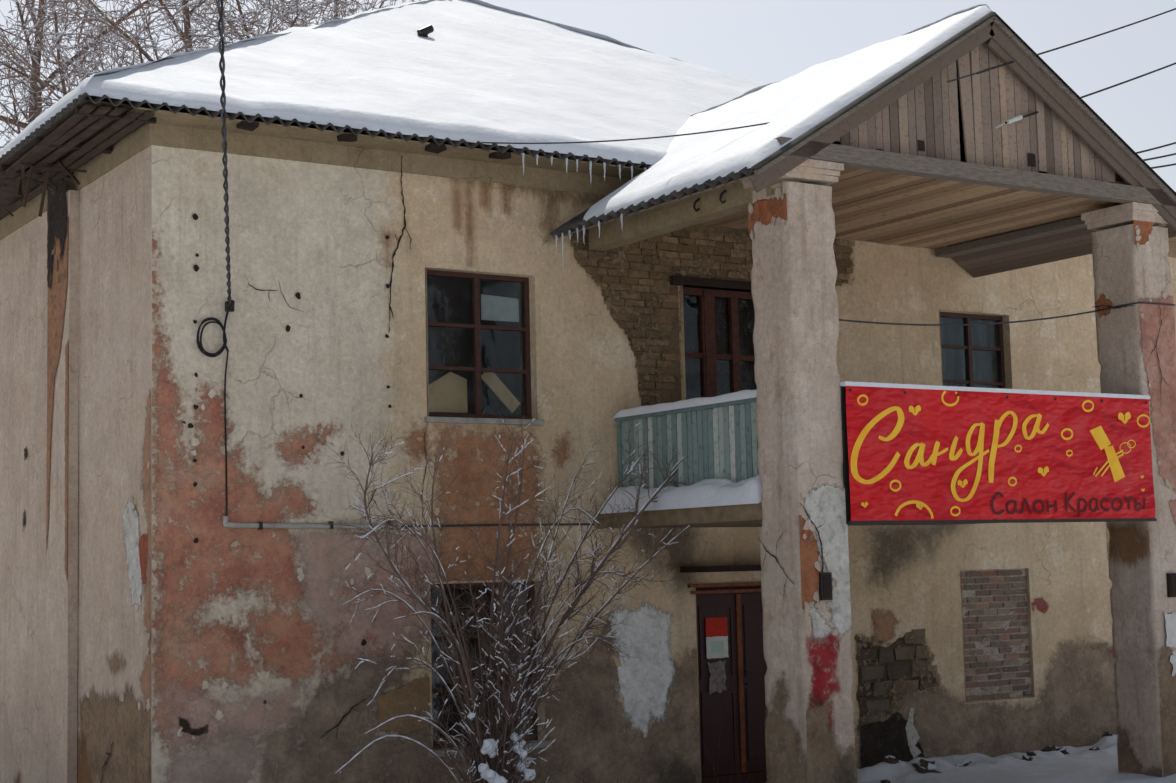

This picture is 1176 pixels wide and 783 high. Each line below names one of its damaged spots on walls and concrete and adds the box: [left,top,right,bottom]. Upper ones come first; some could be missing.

flaking render [46,178,69,579]
crack [248,283,303,312]
crack [389,156,412,331]
flaking render [570,188,787,406]
flaking render [833,239,855,286]
flaking render [1133,220,1169,248]
peeling [1138,291,1176,522]
peeling [78,271,541,783]
flaking render [799,483,942,769]
damp [765,640,1176,783]